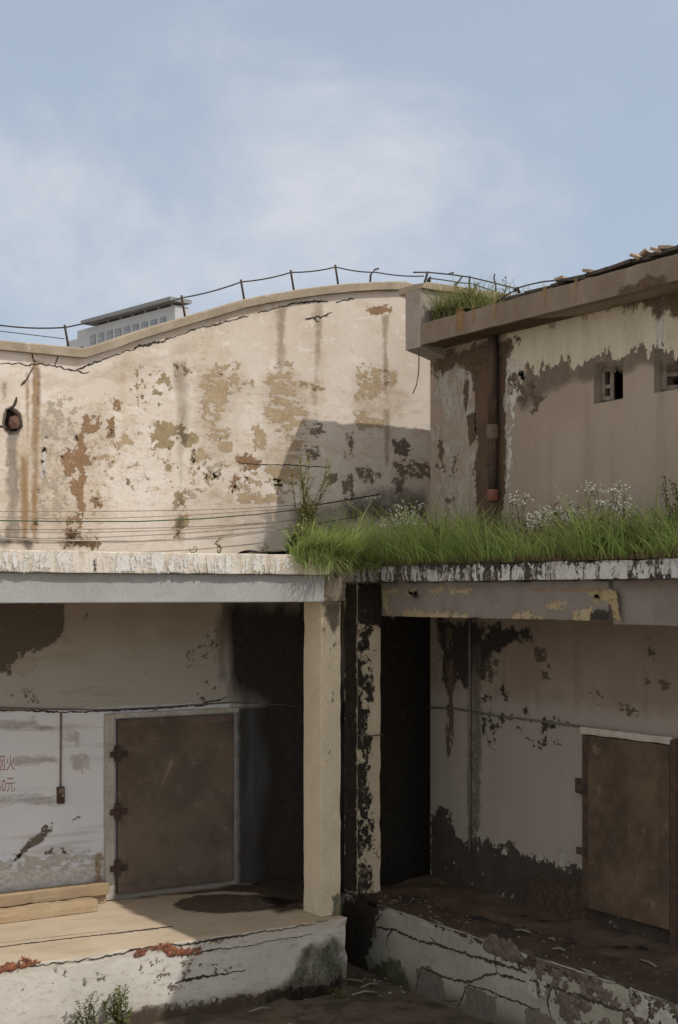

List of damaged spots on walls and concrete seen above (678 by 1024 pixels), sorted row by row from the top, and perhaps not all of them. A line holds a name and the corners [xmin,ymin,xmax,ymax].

rust [27,362,40,444]
crack [0,298,354,428]
peeling [506,370,547,415]
peeling [35,361,326,551]
rust [22,460,37,539]
leakage [0,603,64,675]
peeling [512,597,570,620]
leakage [122,572,593,1024]
peeling [0,822,104,878]
crack [0,921,324,984]
crack [372,914,678,1018]
leakage [586,908,670,950]